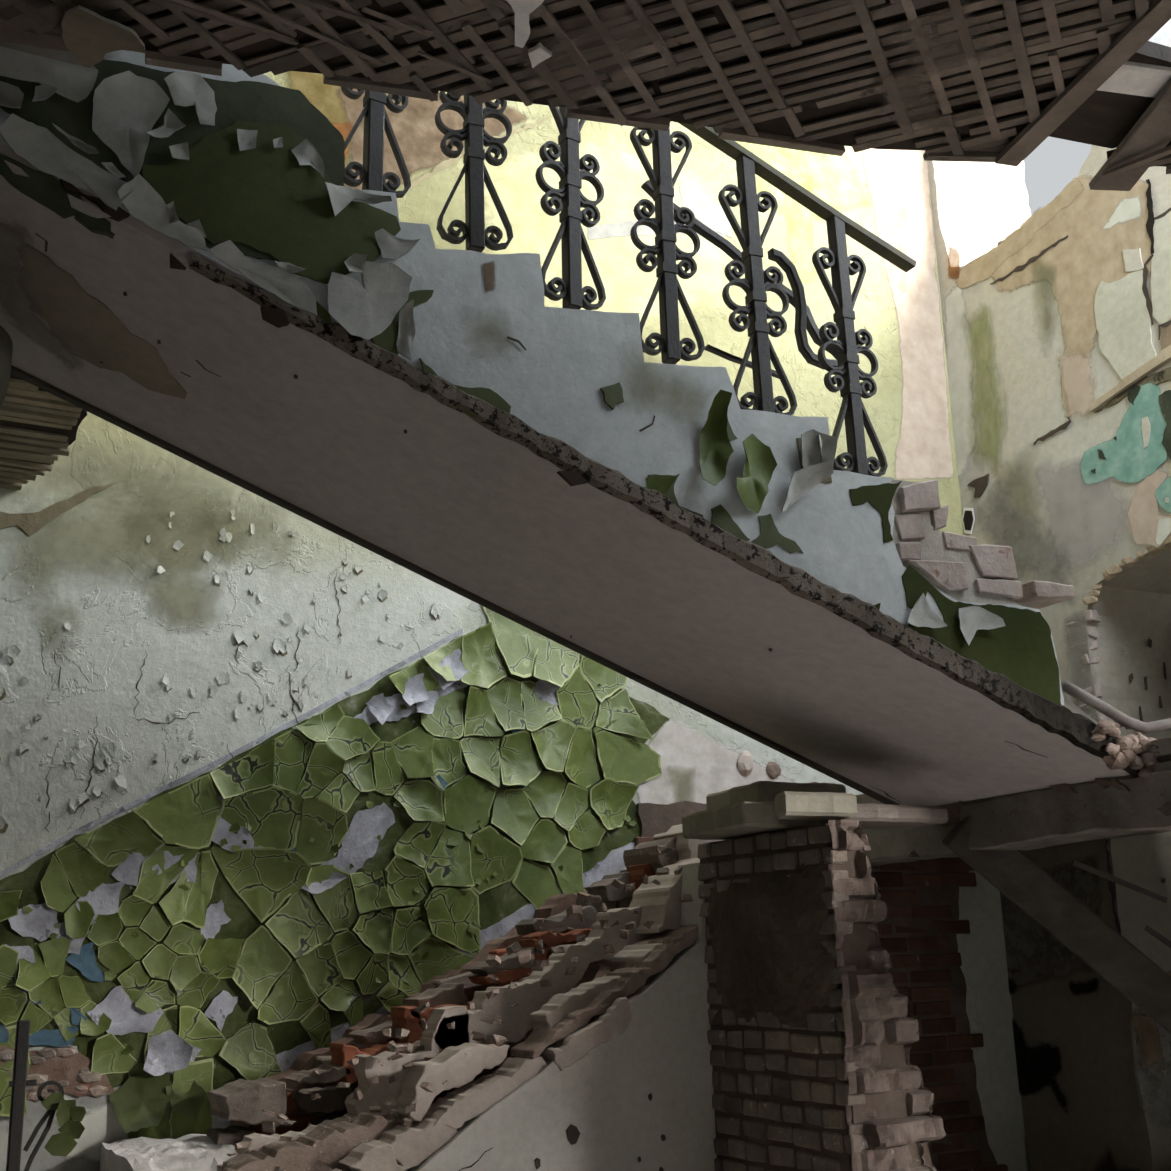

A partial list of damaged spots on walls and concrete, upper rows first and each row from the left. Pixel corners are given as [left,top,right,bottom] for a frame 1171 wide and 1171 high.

peeling [0,46,438,376]
flaking render [948,176,1152,417]
crack [1142,179,1171,325]
leakage [970,311,1003,463]
leakage [1159,390,1171,460]
leakage [25,463,260,621]
crack [130,650,200,724]
crack [286,632,301,723]
crack [333,571,341,643]
leakage [978,449,1124,584]
peeling [0,606,795,1156]
flaking render [803,820,1008,1171]